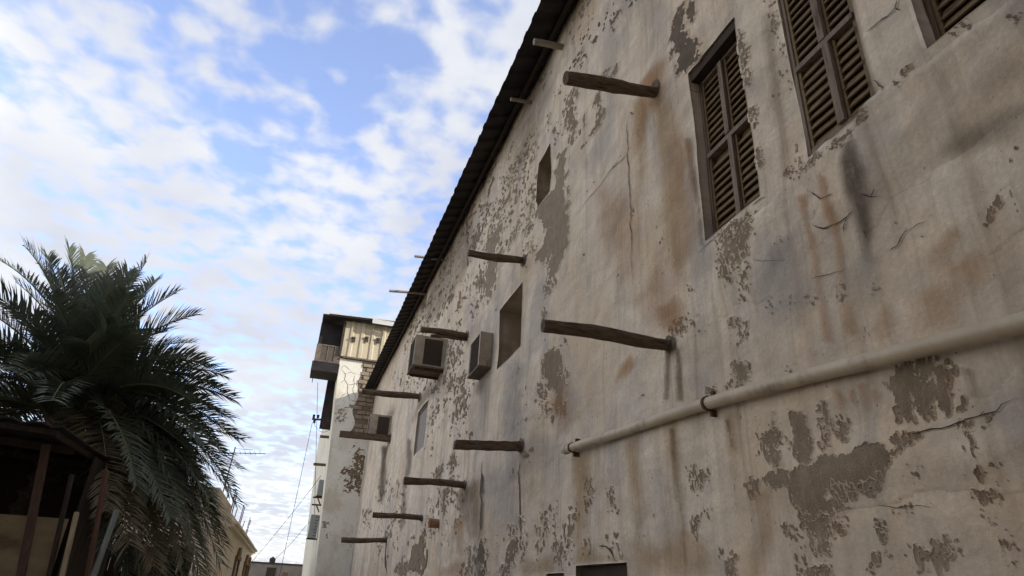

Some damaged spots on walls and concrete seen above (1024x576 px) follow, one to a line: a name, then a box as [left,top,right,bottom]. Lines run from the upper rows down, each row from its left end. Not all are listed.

peeling [667,0,704,78]
crack [575,112,633,281]
crack [813,190,877,232]
peeling [350,67,623,576]
peeling [705,210,756,396]
peeling [338,445,365,496]
peeling [743,352,1019,576]
crack [912,397,1019,434]